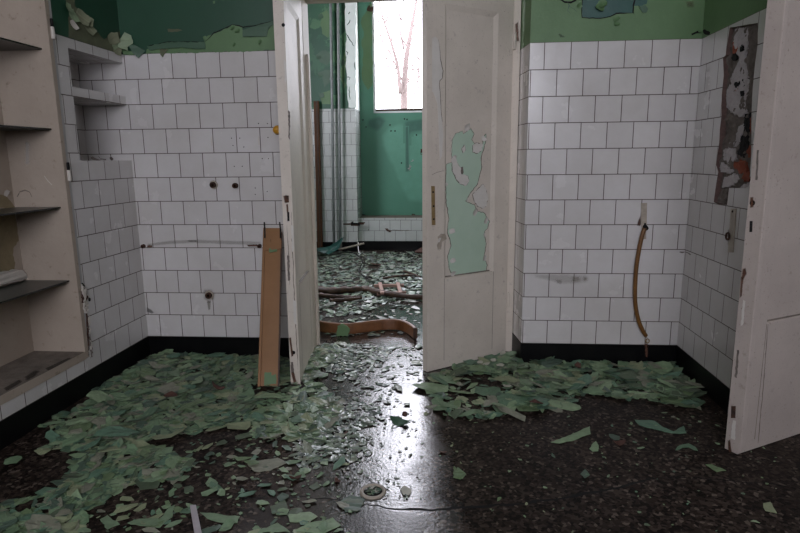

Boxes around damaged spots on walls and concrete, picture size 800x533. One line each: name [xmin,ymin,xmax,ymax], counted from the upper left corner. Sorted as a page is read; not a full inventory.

peeling [66,0,275,58]
peeling [561,0,648,26]
spalling [714,23,759,205]
peeling [437,123,490,276]